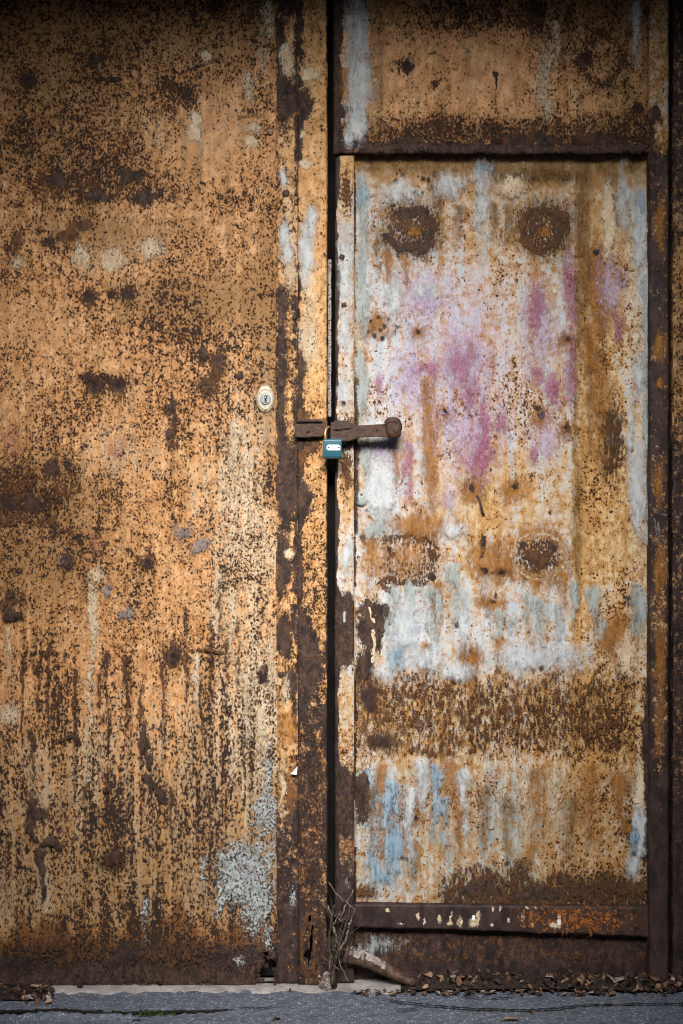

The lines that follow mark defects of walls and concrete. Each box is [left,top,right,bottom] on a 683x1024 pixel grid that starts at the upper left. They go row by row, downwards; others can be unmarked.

corrosion [276,0,314,202]
corrosion [25,127,203,250]
corrosion [334,0,664,496]
corrosion [360,373,459,633]
corrosion [276,283,328,977]
peeling [335,593,391,682]
corrosion [467,525,574,614]
peeling [335,764,376,833]
corrosion [354,614,642,877]
corrosion [0,933,257,986]
peeling [416,906,537,927]
corrosion [432,839,648,937]